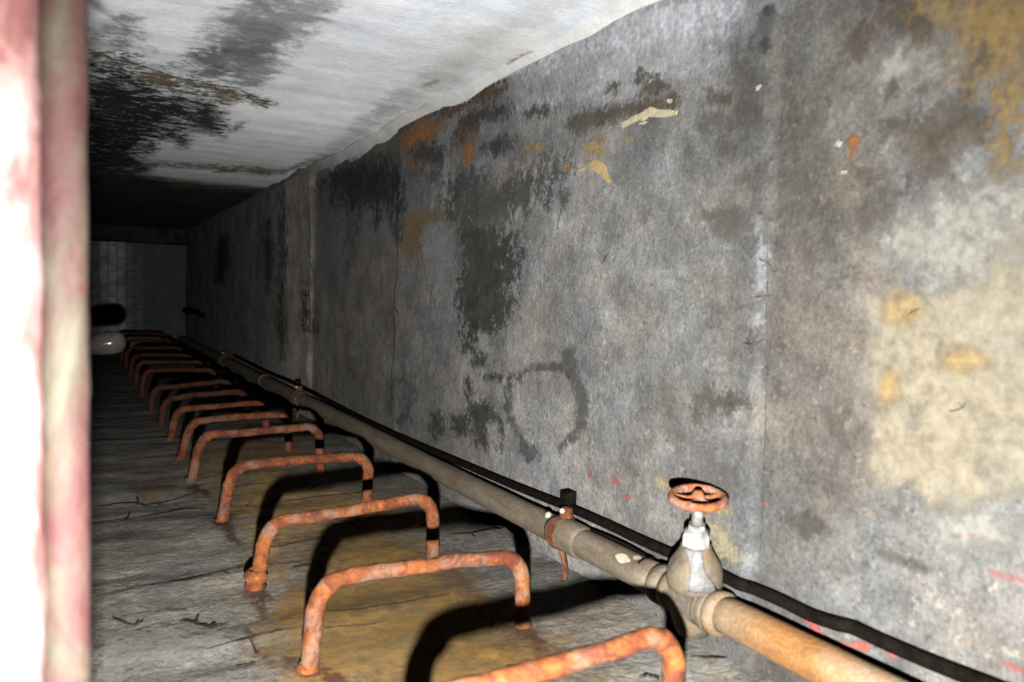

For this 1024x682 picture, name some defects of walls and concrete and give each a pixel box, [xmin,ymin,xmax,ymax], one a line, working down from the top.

water stain [87,0,332,176]
rust [398,79,508,171]
flaking render [577,159,612,183]
water stain [567,67,678,156]
flaking render [621,99,678,128]
water stain [706,89,732,107]
rust [847,136,859,161]
water stain [881,0,1024,180]
crack [391,224,399,379]
water stain [309,99,589,461]
crack [94,483,360,525]
crack [96,533,353,626]